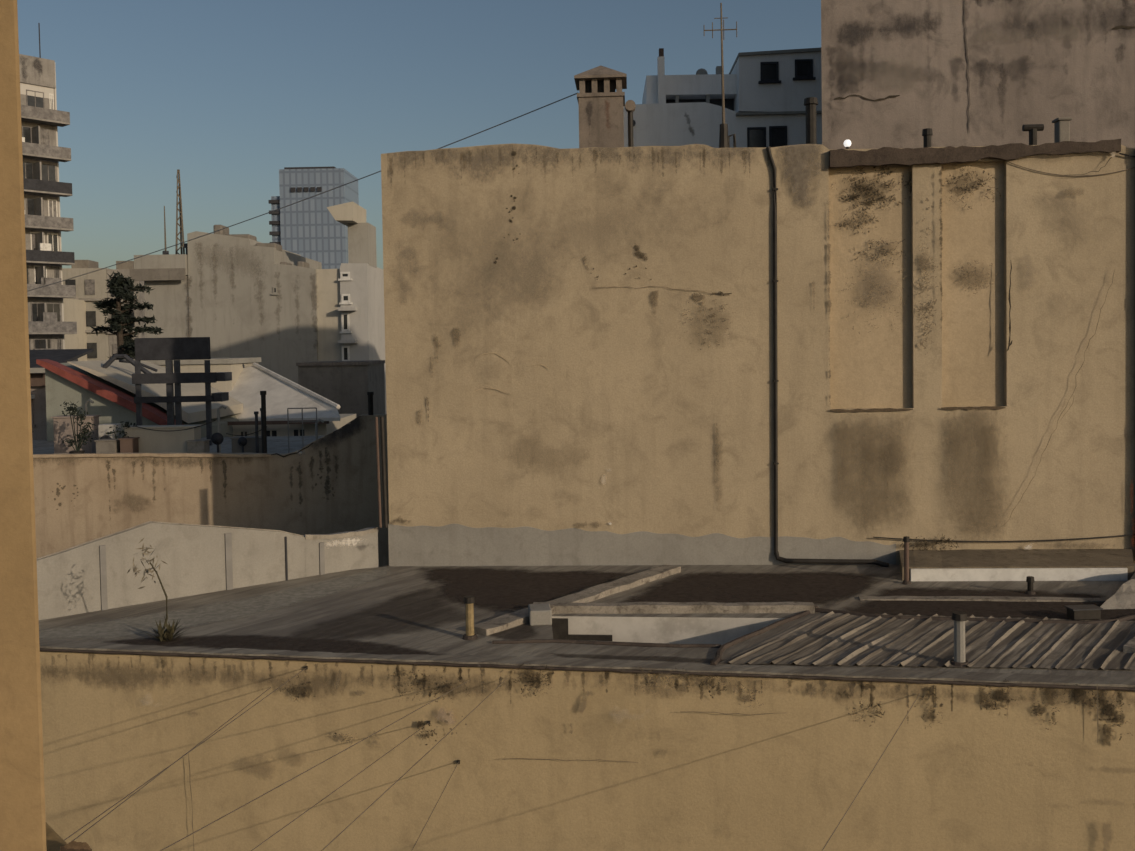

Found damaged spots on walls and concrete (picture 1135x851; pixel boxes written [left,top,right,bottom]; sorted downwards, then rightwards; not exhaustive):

leakage [840,15,936,45]
leakage [781,144,821,205]
leakage [812,166,1001,355]
crack [1001,264,1115,527]
leakage [292,416,361,504]
leakage [391,665,486,704]
leakage [843,681,885,726]
leakage [906,685,953,729]
leakage [979,679,1016,716]
leakage [1031,684,1132,746]
spalling [60,841,92,851]